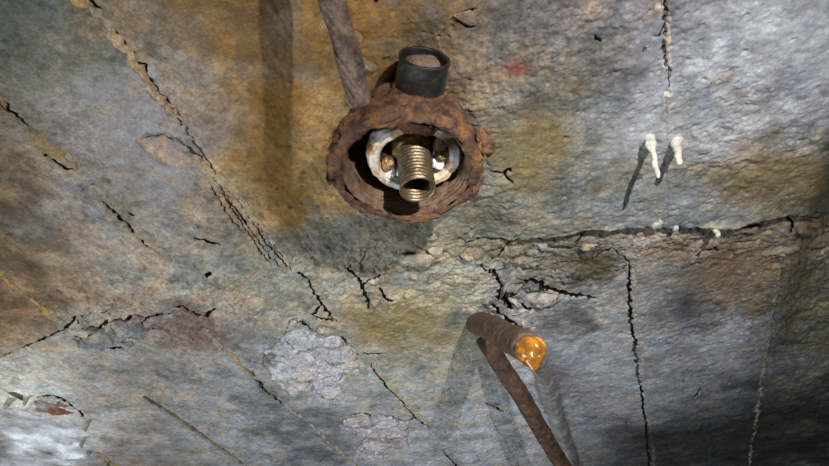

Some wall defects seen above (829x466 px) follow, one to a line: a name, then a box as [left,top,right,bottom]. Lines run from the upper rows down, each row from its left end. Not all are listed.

crack [0,102,28,126]
spalling [134,132,208,172]
crack [89,0,347,342]
crack [345,265,393,310]
crack [465,237,595,327]
crack [4,305,217,356]
spalling [262,315,361,403]
crack [575,230,651,466]
crack [37,394,84,417]
crack [248,369,282,404]
crack [353,353,432,437]
spalling [337,415,412,461]